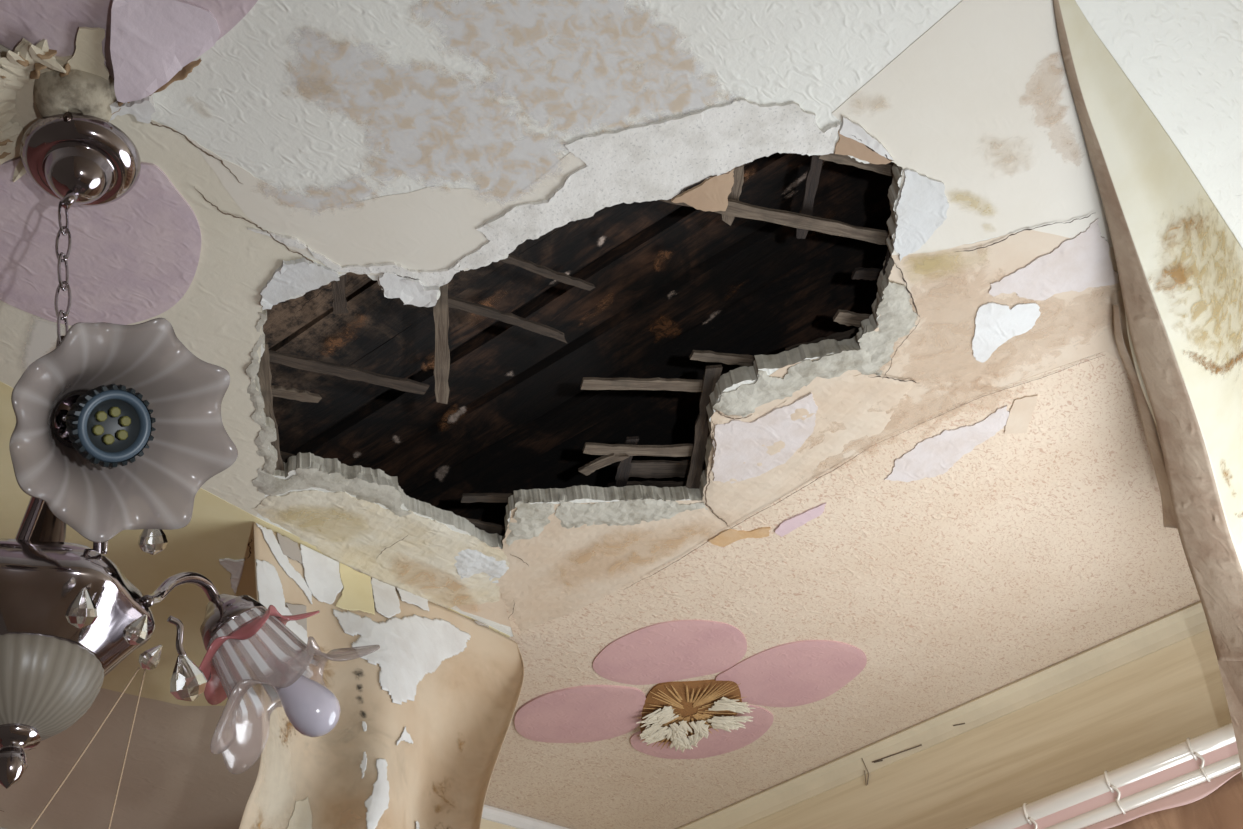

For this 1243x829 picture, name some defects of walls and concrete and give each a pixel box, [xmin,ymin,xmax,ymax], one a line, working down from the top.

peeling [150,58,202,96]
crack [150,122,242,184]
damp [289,0,729,200]
crack [197,190,343,312]
crack [876,266,920,383]
peeling [893,168,949,262]
crack [957,213,1093,252]
peeling [972,218,1119,363]
damp [1157,220,1243,374]
peeling [219,98,919,705]
peeling [884,395,1038,482]
peeling [360,752,390,829]